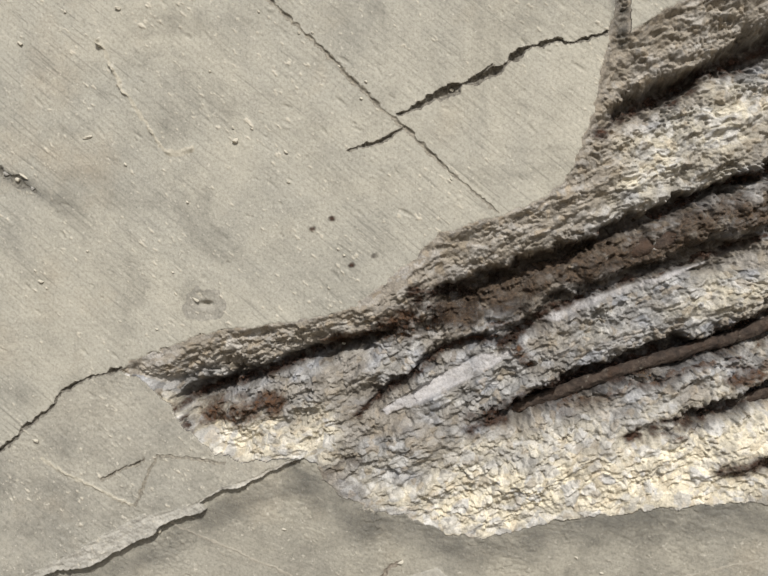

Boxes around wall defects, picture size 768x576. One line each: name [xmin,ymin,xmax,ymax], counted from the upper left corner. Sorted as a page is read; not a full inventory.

crack [346,30,609,152]
spalling [120,0,768,540]
corrosion [172,165,768,435]
crack [0,366,123,453]
crack [100,456,145,482]
peeling [0,371,299,576]
corrosion [624,399,745,442]